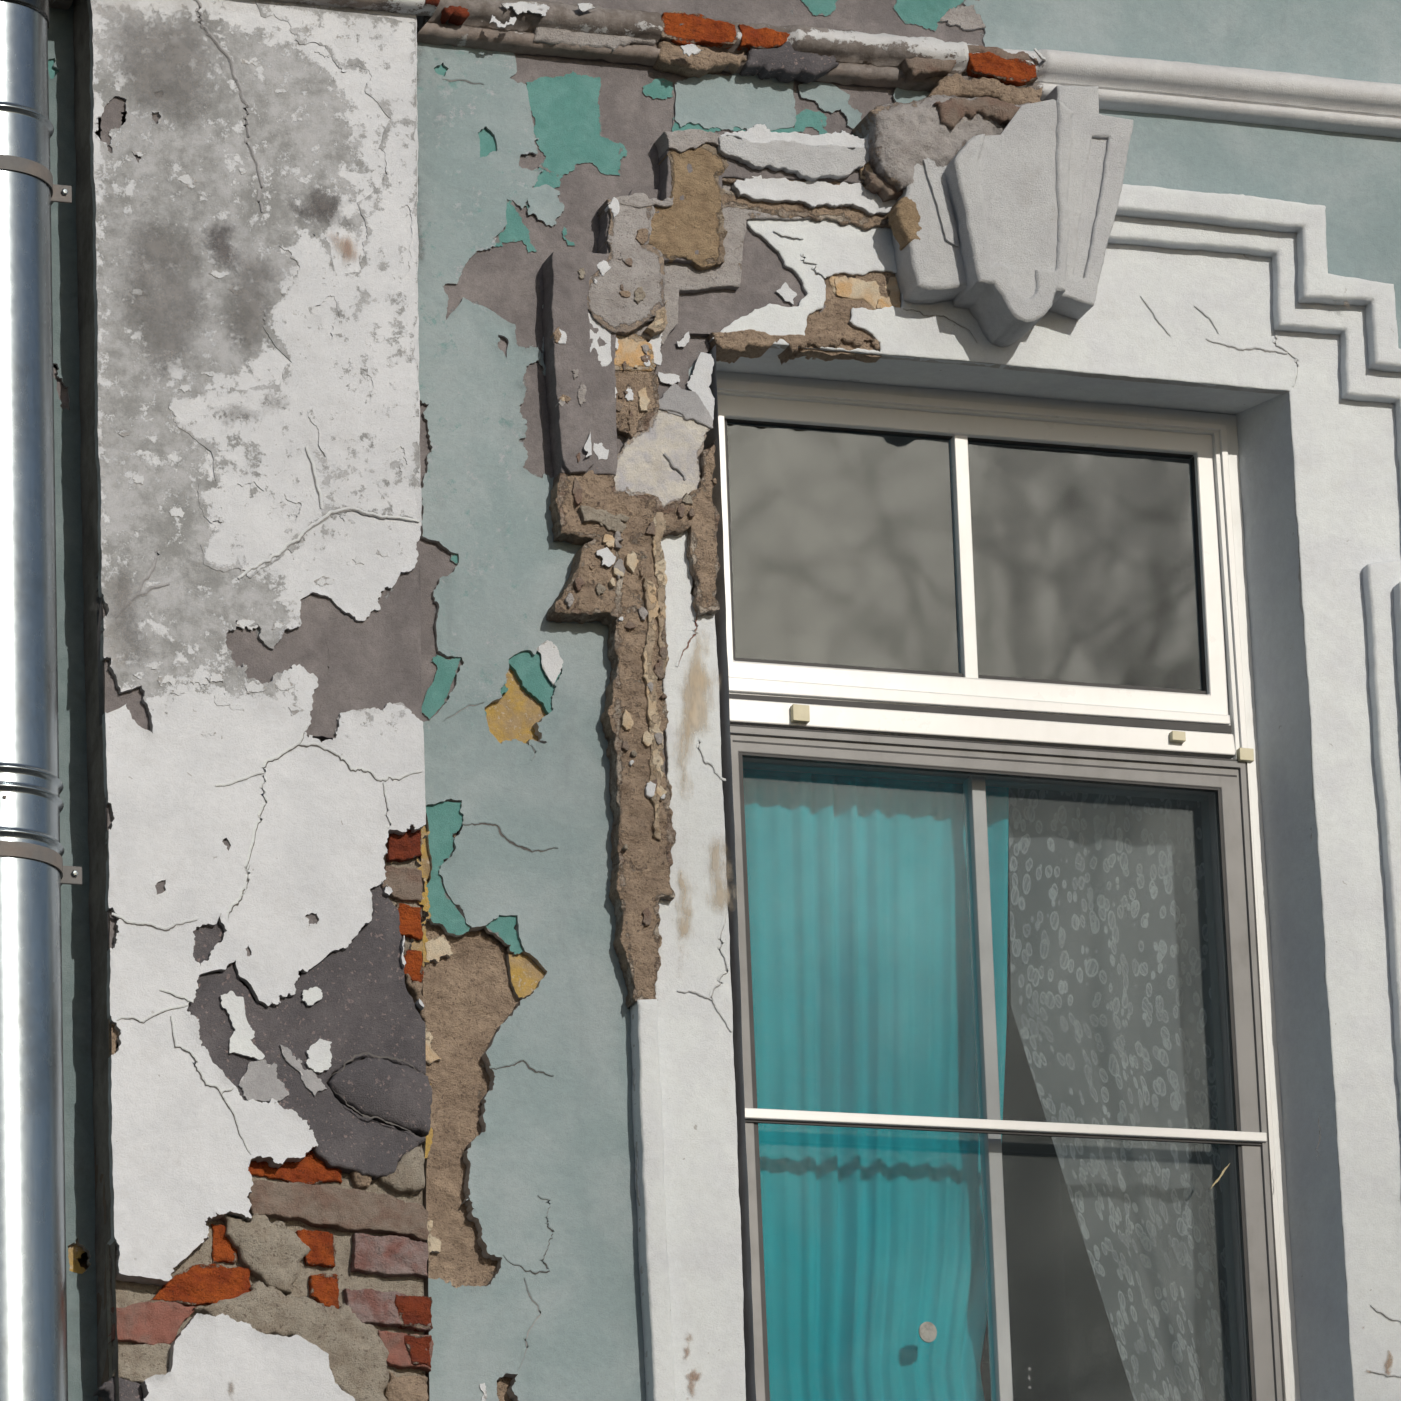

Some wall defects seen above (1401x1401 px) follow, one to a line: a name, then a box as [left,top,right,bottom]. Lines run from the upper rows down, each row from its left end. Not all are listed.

crack [194,0,264,212]
peeling [680,44,703,57]
peeling [489,0,986,46]
water stain [211,227,268,339]
peeling [96,0,463,741]
crack [1194,305,1300,386]
crack [238,447,419,579]
peeling [444,54,1031,1008]
crack [112,644,422,931]
crack [677,911,733,1032]
crack [116,988,252,1155]
flaking render [93,797,545,1401]